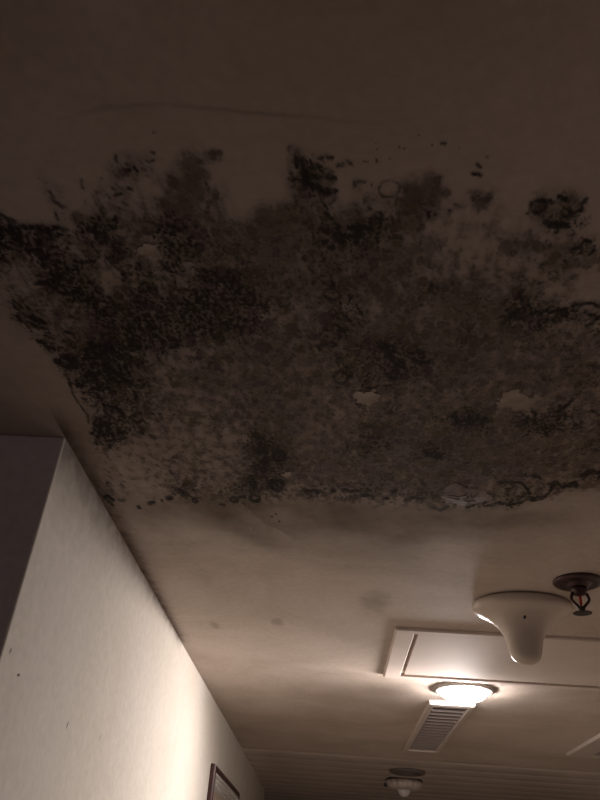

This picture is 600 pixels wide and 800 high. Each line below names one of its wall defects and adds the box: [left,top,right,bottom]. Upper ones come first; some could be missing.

water stain [0,150,600,519]
peeling [352,389,380,407]